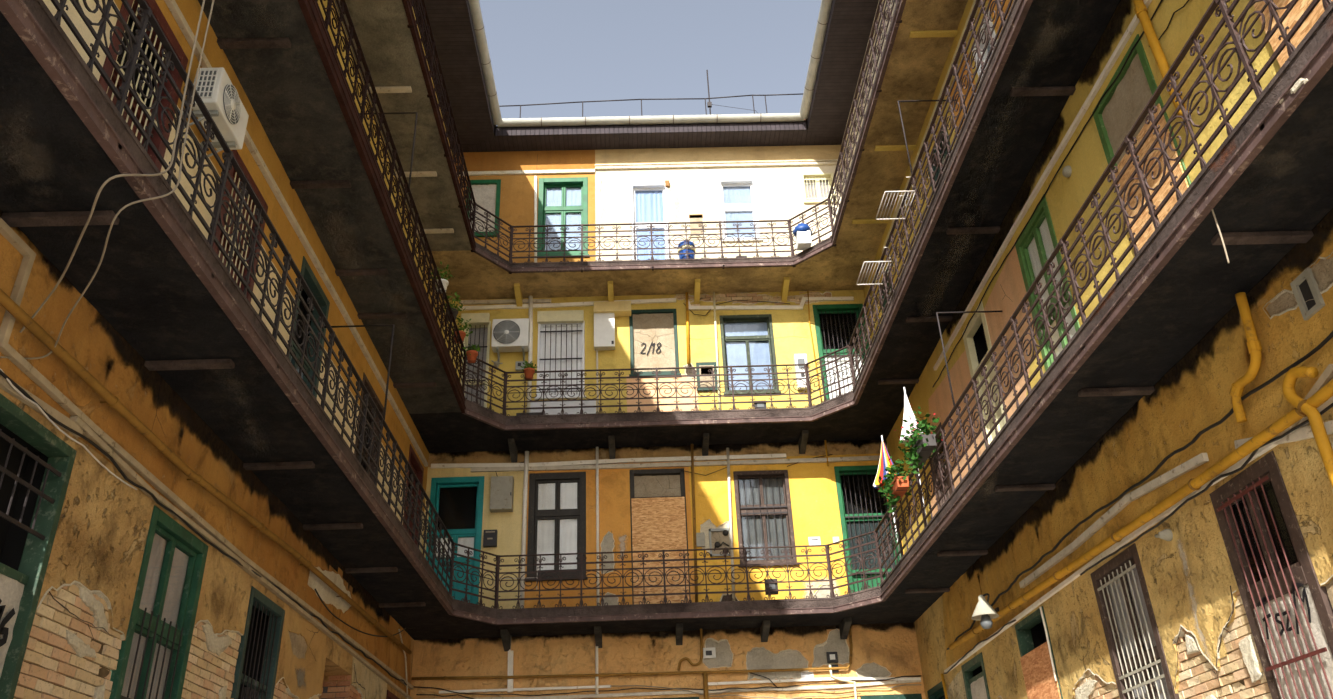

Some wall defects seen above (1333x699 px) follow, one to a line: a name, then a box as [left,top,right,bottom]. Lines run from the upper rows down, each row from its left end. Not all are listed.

flaking render [1263,252,1333,320]
peeling [308,566,352,613]
flaking render [1320,575,1333,608]
flaking render [13,580,125,699]
flaking render [181,619,243,699]
flaking render [703,629,892,680]
flaking render [1072,669,1120,699]
flaking render [1173,590,1272,699]